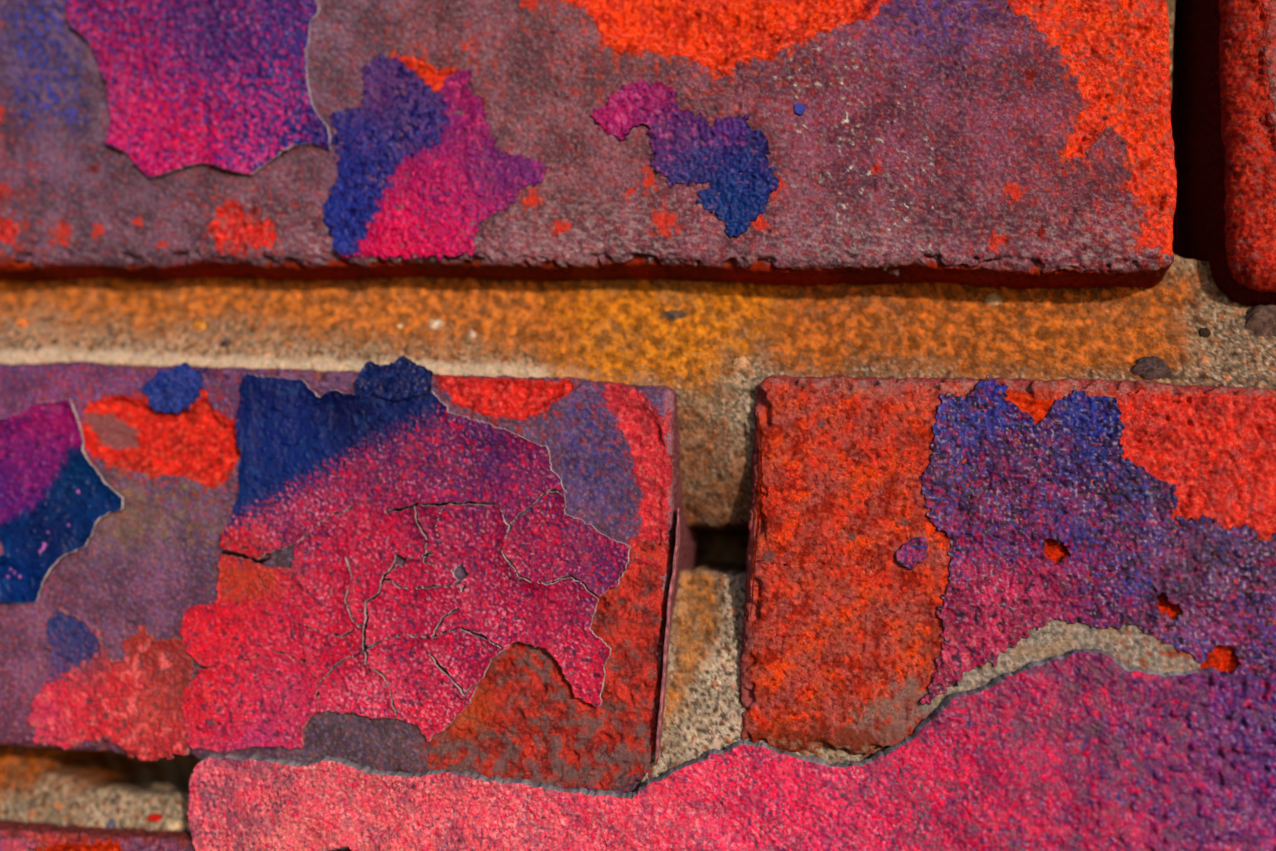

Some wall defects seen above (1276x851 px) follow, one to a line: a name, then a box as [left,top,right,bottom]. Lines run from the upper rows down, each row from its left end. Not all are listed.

peeling [65,0,547,263]
peeling [591,80,779,238]
crack [222,551,271,564]
crack [365,502,473,657]
crack [408,633,467,693]
peeling [0,355,1276,851]